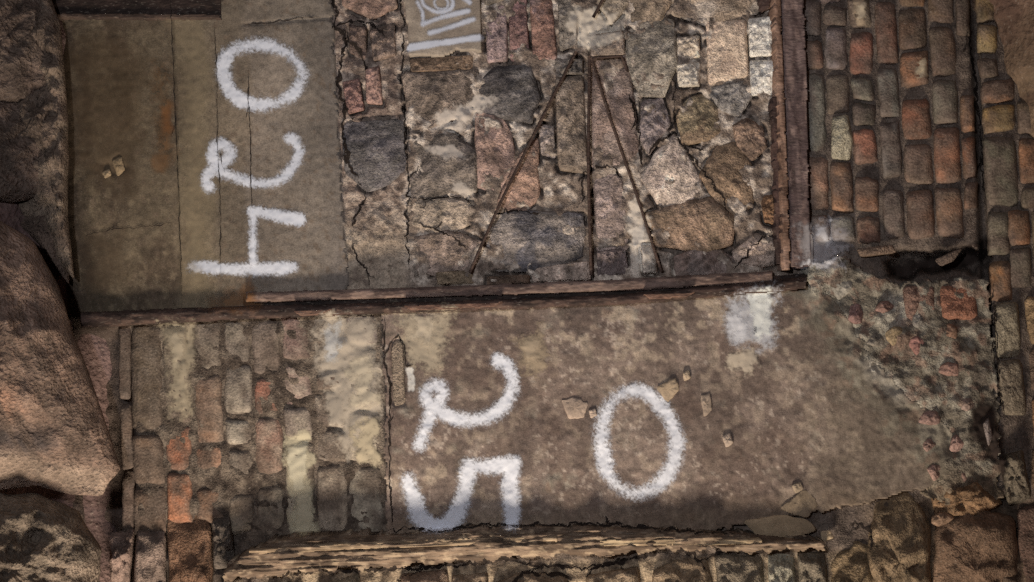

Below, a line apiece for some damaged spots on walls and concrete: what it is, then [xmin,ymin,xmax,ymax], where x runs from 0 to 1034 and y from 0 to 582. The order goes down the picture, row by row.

crack [86,0,182,294]
crack [216,109,225,274]
crack [245,78,253,205]
crack [251,0,545,283]
damp [799,216,849,269]
spalling [857,238,989,280]
damp [724,286,781,372]